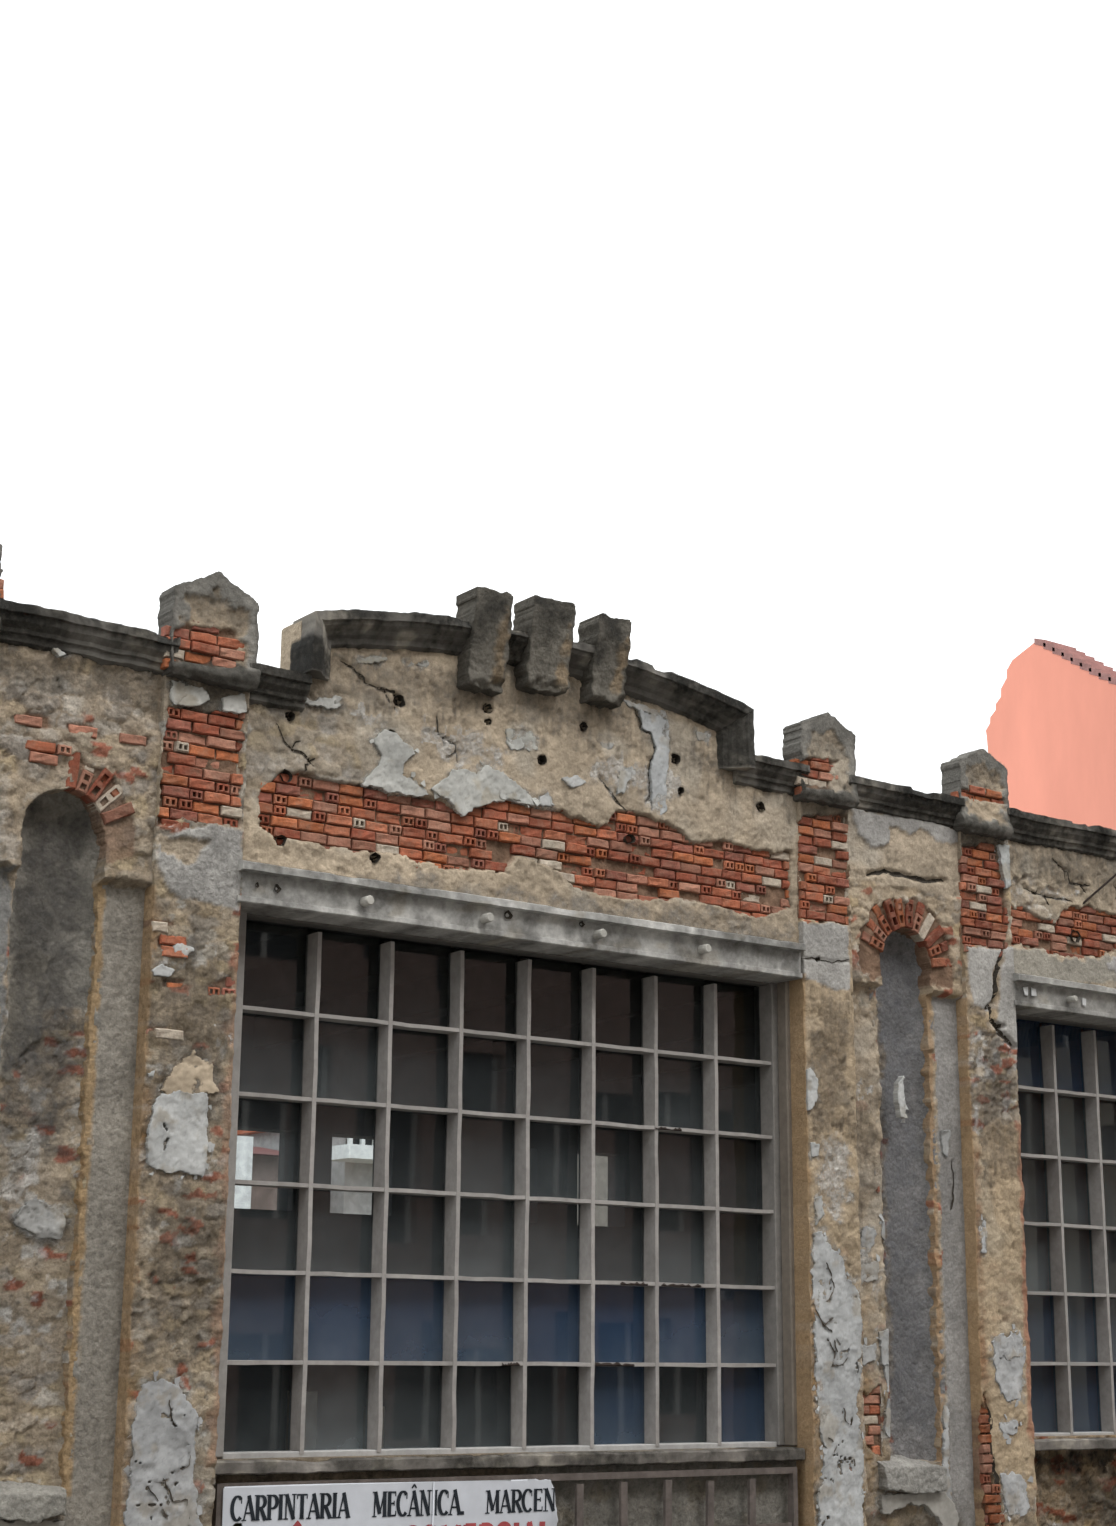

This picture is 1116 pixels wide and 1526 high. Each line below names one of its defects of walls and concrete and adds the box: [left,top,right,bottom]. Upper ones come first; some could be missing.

peeling [51,648,67,658]
flaking render [14,714,98,766]
flaking render [119,620,850,925]
flaking render [950,785,1004,804]
flaking render [151,921,188,959]
flaking render [866,842,1116,959]
peeling [810,1195,959,1526]
peeling [978,1324,1033,1526]